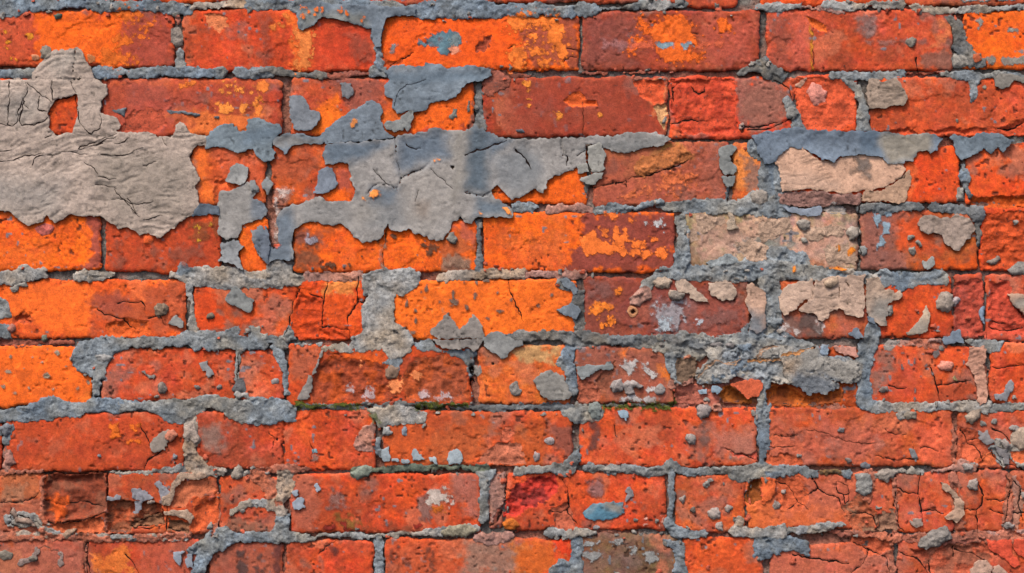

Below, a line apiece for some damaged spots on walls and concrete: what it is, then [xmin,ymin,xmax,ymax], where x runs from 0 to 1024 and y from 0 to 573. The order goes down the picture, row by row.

crack [0,81,117,150]
peeling [0,1,739,270]
crack [368,143,496,200]
crack [465,140,531,169]
peeling [752,77,1024,217]
peeling [668,274,903,408]
peeling [906,305,930,335]
spalling [917,196,1024,406]
crack [727,428,1024,573]